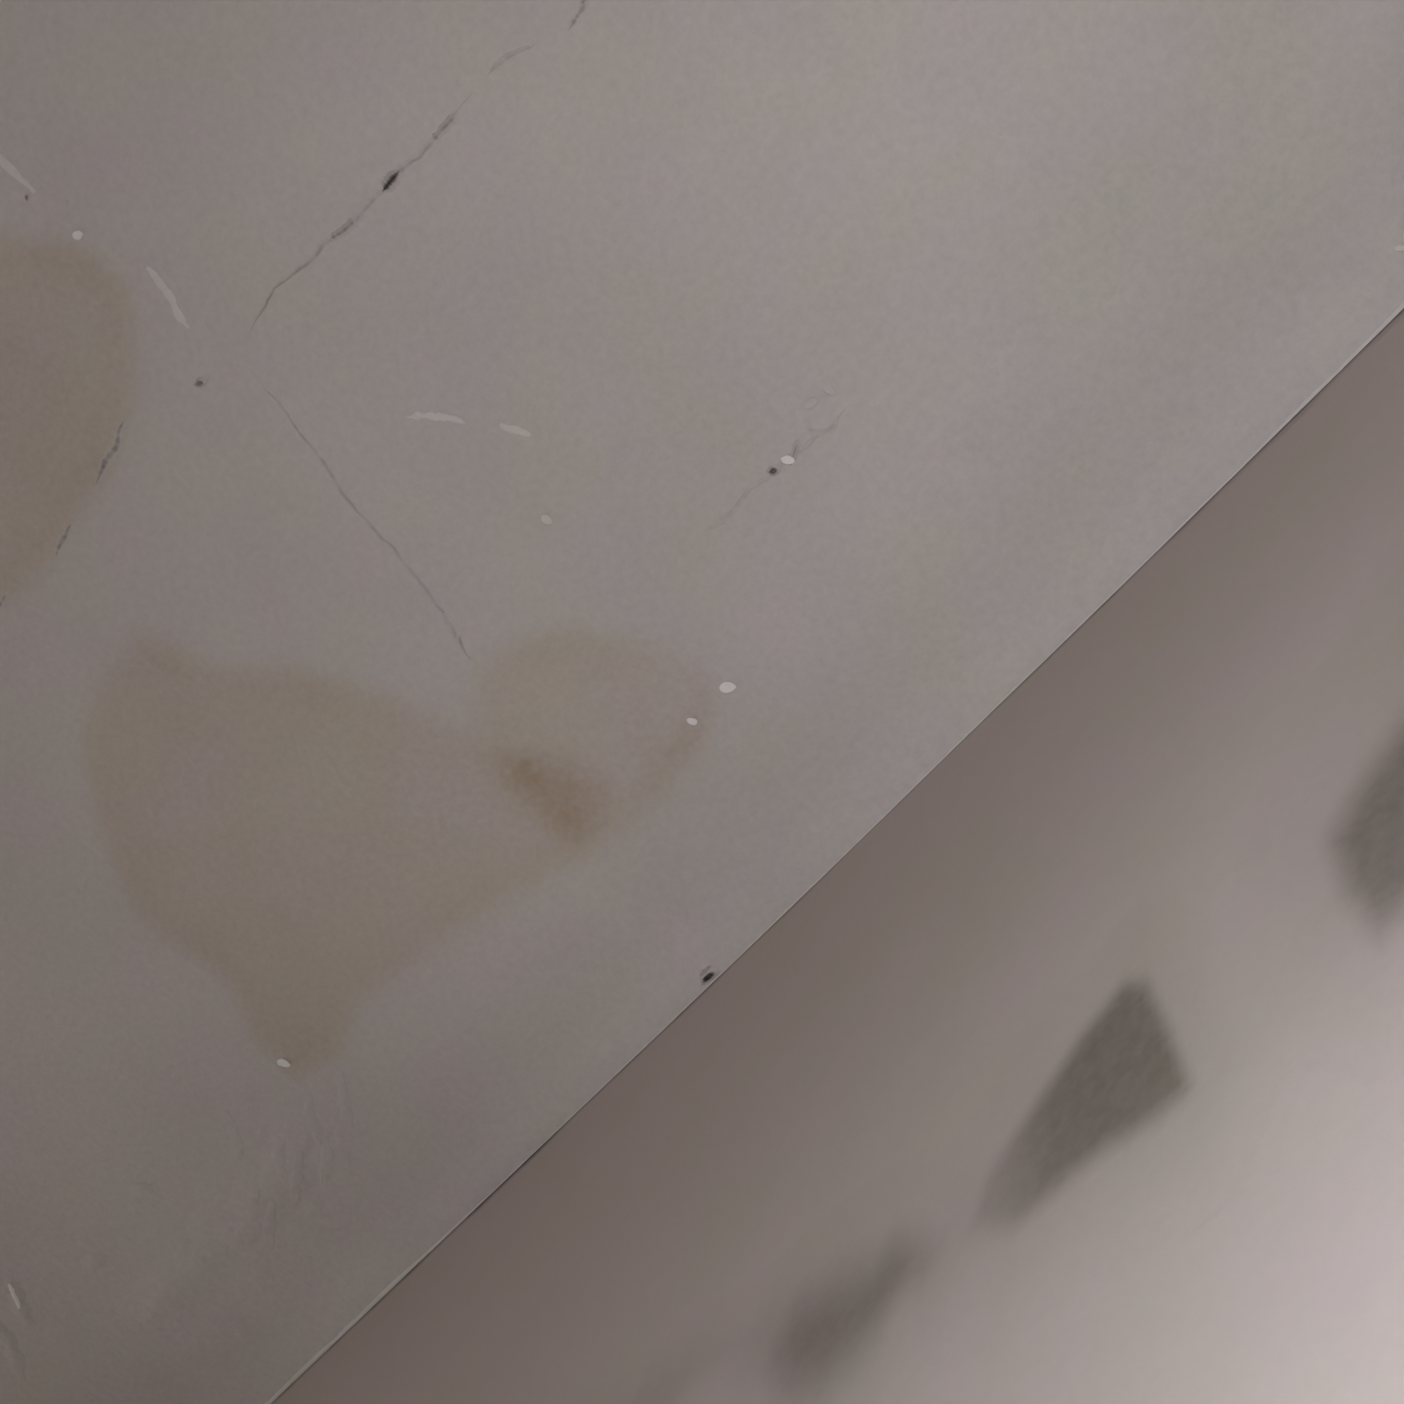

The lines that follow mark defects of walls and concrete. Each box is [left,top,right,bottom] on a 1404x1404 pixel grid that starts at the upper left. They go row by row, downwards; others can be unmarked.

crack [247,44,535,337]
crack [568,0,592,31]
crack [0,418,124,614]
water stain [0,218,158,625]
water stain [69,610,738,1089]
crack [265,301,1404,1404]